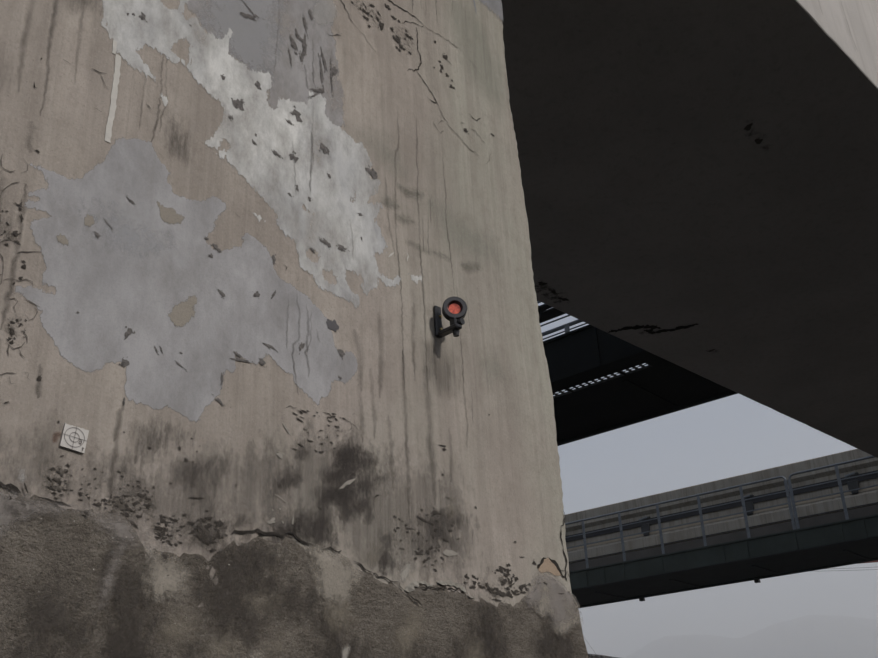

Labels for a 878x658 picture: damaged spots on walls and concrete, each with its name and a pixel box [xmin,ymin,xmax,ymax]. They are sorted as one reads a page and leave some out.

peeling [288,9,313,66]
spalling [351,0,413,54]
peeling [228,98,245,121]
peeling [309,48,338,99]
crack [389,0,491,164]
crack [608,323,699,334]
crack [0,481,72,507]
leakage [197,410,376,658]
leakage [102,545,186,658]
crack [232,528,422,605]
leakage [379,538,508,658]
spalling [464,564,531,602]